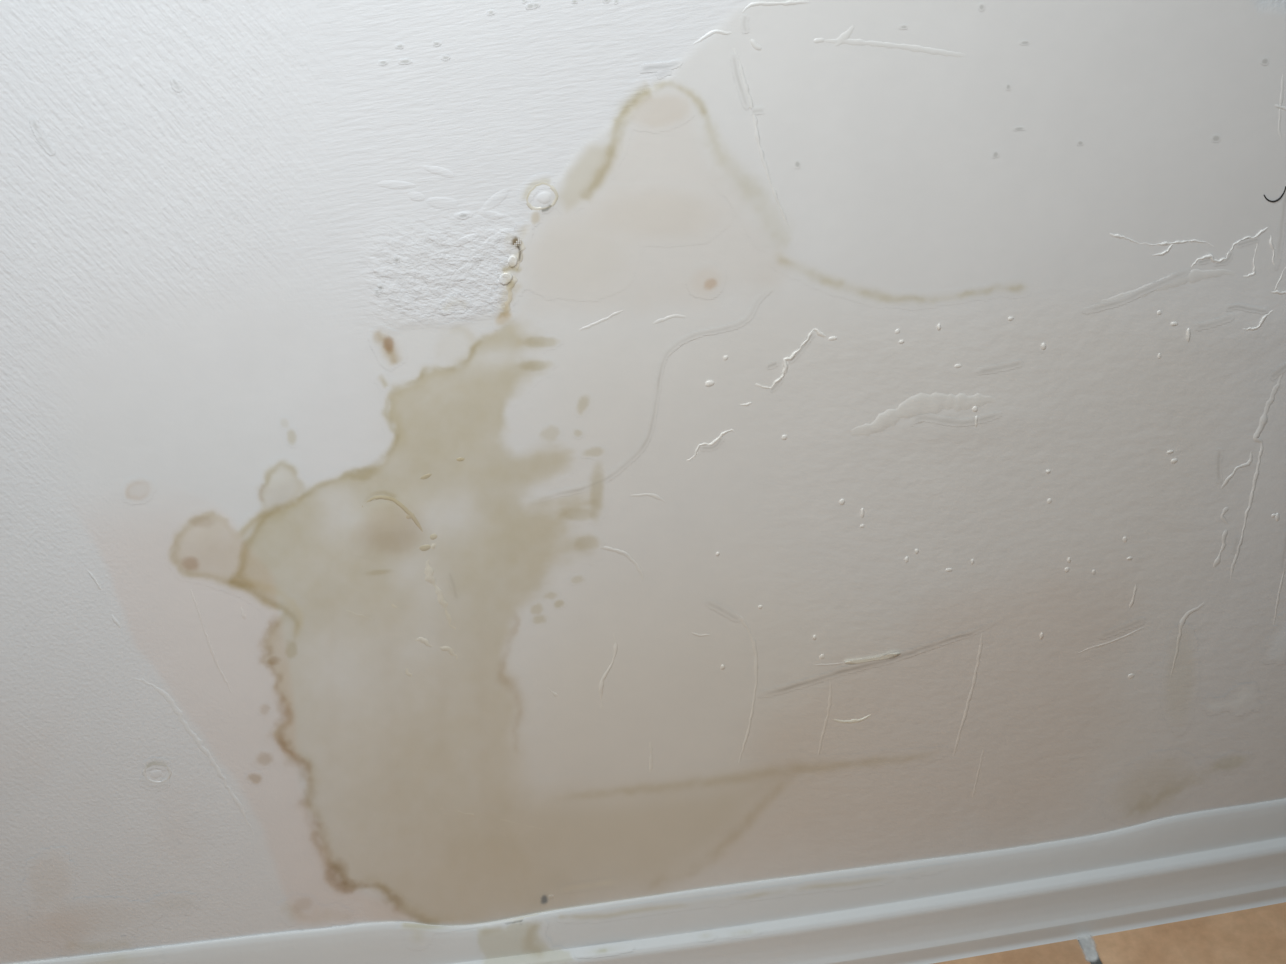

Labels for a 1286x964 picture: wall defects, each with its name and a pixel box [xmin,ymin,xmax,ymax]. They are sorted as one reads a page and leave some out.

crack [687,329,826,461]
leakage [524,76,1032,311]
crack [1109,227,1286,331]
leakage [164,293,952,951]